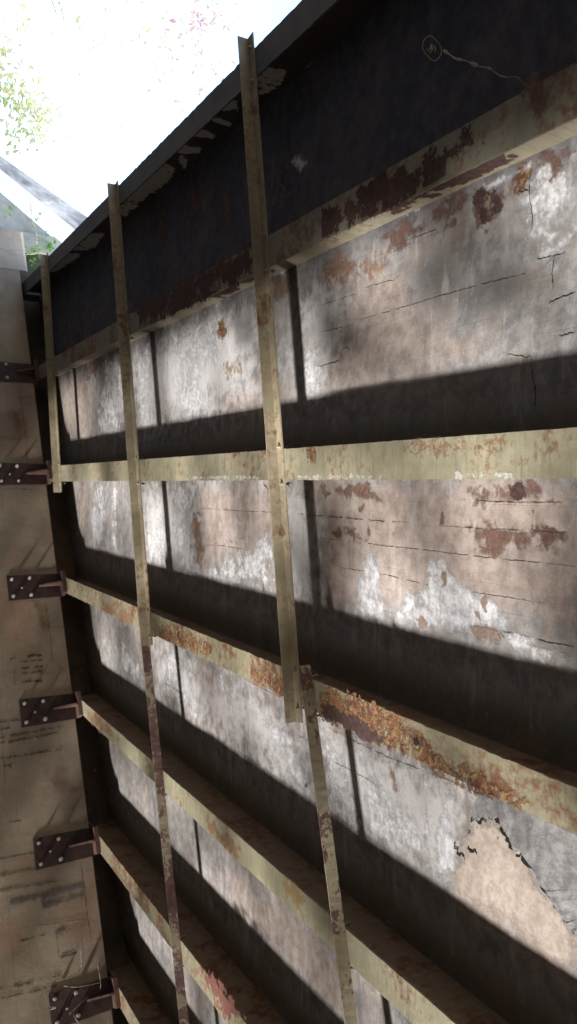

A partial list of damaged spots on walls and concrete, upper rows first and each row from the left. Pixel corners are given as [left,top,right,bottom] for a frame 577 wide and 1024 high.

peeling [257,67,286,95]
peeling [120,100,239,217]
rust [321,124,570,284]
rust [135,242,254,326]
crack [316,252,573,367]
water stain [356,553,384,617]
crack [299,514,574,567]
water stain [395,559,551,663]
rust [455,470,541,506]
rust [475,521,565,558]
rust [318,687,529,812]
spalling [450,794,577,971]